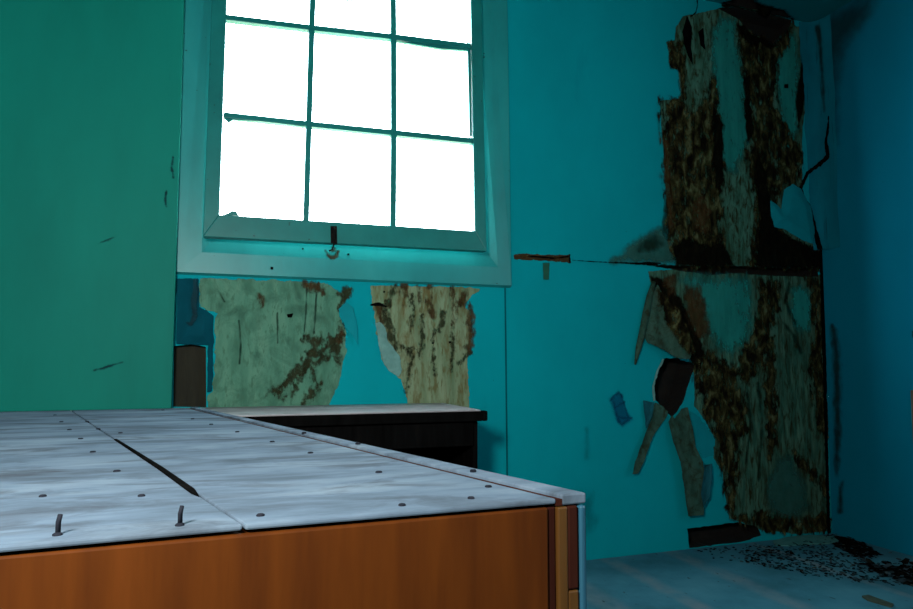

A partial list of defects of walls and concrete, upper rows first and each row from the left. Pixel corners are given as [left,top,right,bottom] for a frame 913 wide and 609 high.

crack [799,116,830,251]
crack [574,259,661,267]
peeling [648,0,832,536]
peeling [199,278,352,407]
peeling [370,283,480,408]